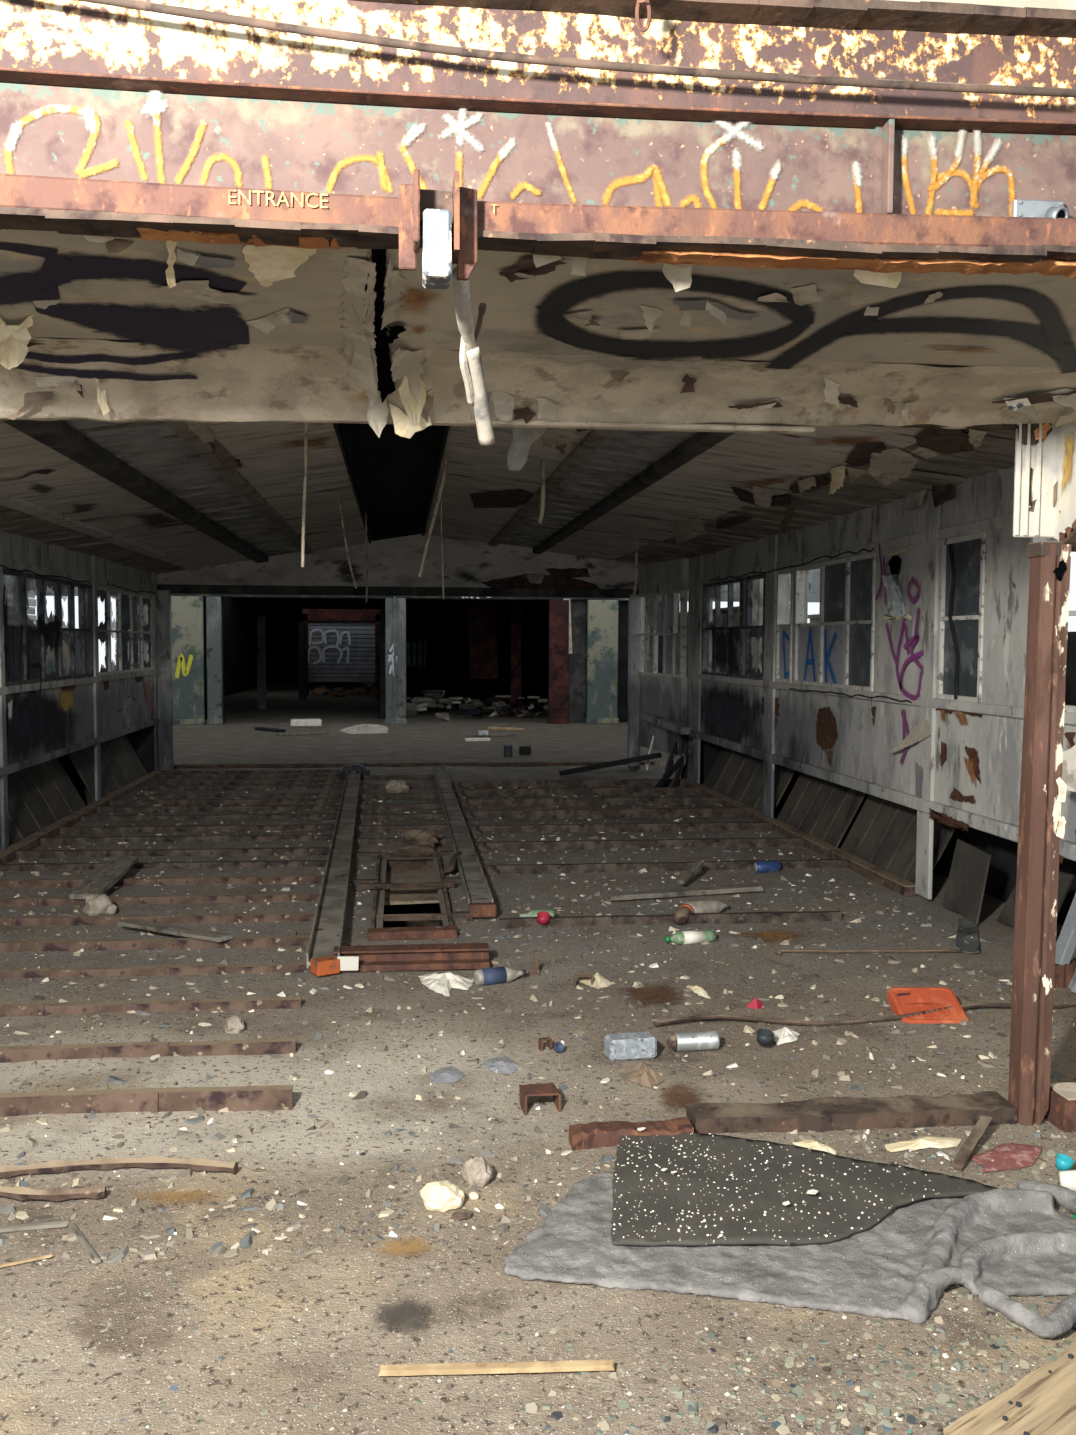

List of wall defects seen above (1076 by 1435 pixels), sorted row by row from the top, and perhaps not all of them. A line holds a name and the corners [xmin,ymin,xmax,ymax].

rust [420,189,453,225]
peeling [0,300,61,370]
peeling [160,240,317,304]
crack [340,249,425,403]
peeling [498,254,588,283]
peeling [618,263,823,340]
rust [626,250,1076,279]
peeling [8,375,110,420]
peeling [366,353,434,439]
peeling [797,446,954,511]
peeling [992,388,1076,507]
peeling [1056,777,1067,839]